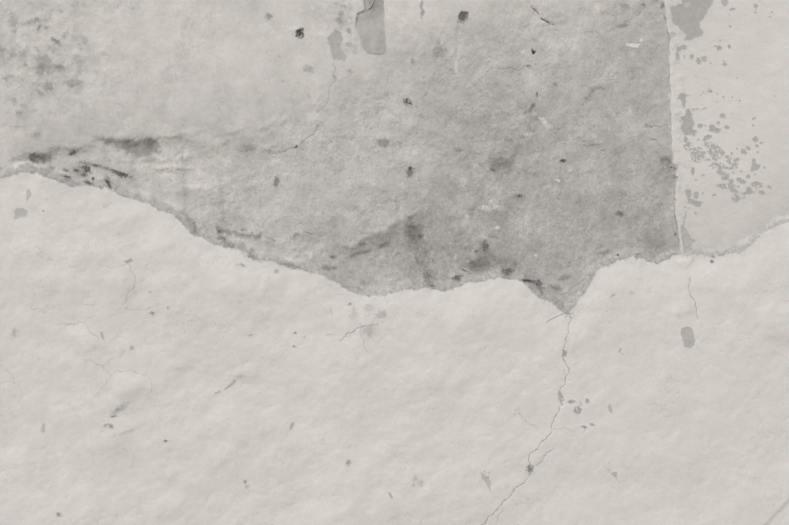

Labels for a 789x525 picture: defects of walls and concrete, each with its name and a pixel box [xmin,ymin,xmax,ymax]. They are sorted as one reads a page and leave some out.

spalling [0,0,789,315]
crack [481,313,584,525]